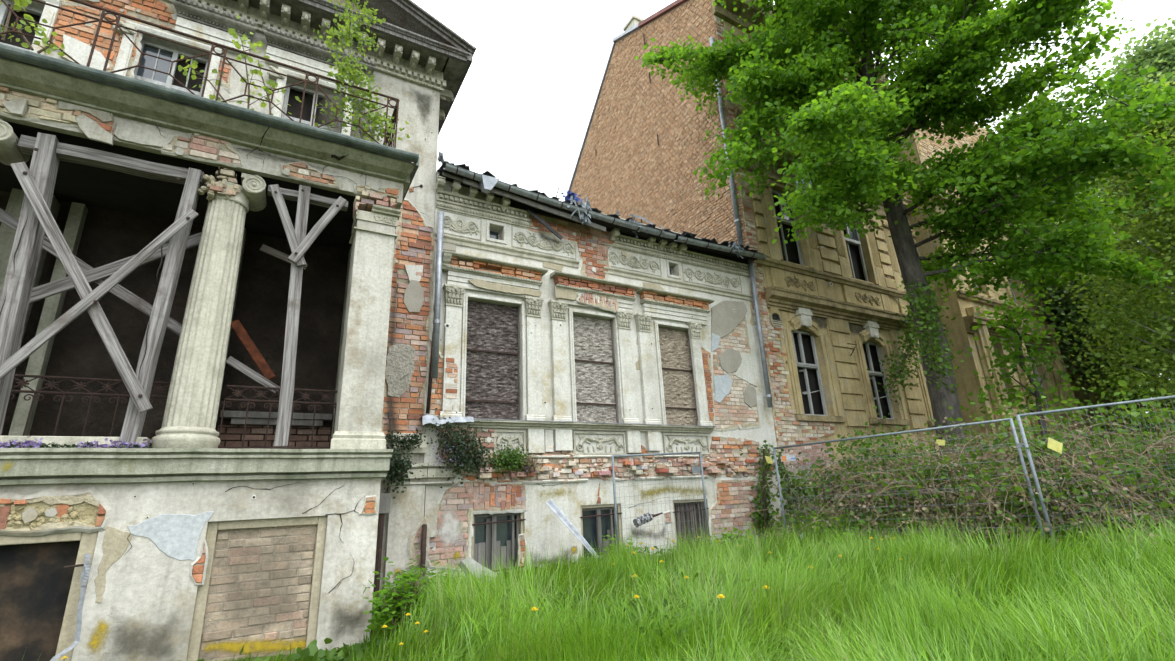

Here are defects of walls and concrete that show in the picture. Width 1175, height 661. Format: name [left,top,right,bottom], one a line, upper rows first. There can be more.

spalling [49,0,177,78]
spalling [0,86,244,201]
spalling [280,161,339,189]
spalling [353,184,835,572]
spalling [0,486,113,536]
spalling [189,540,209,586]
crack [225,482,366,593]